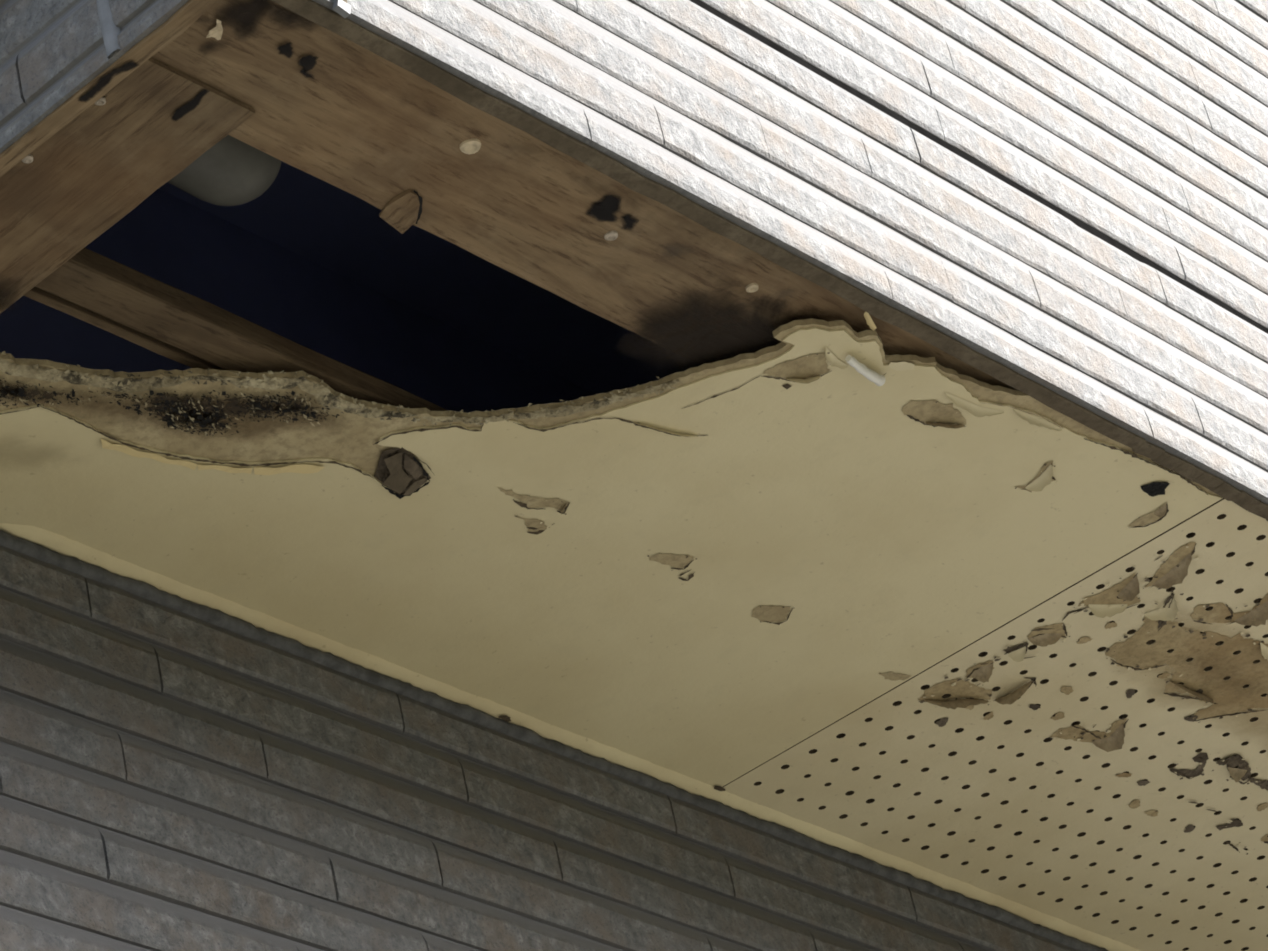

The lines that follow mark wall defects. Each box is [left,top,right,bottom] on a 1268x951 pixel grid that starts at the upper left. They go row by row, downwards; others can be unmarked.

leakage [220,0,314,34]
leakage [277,42,318,79]
leakage [587,195,638,230]
leakage [631,295,787,372]
peeling [761,353,831,384]
leakage [0,378,340,435]
peeling [901,392,1064,431]
spalling [374,447,434,499]
peeling [497,487,570,535]
peeling [918,542,1268,727]
peeling [1050,712,1129,752]
peeling [1166,753,1268,811]